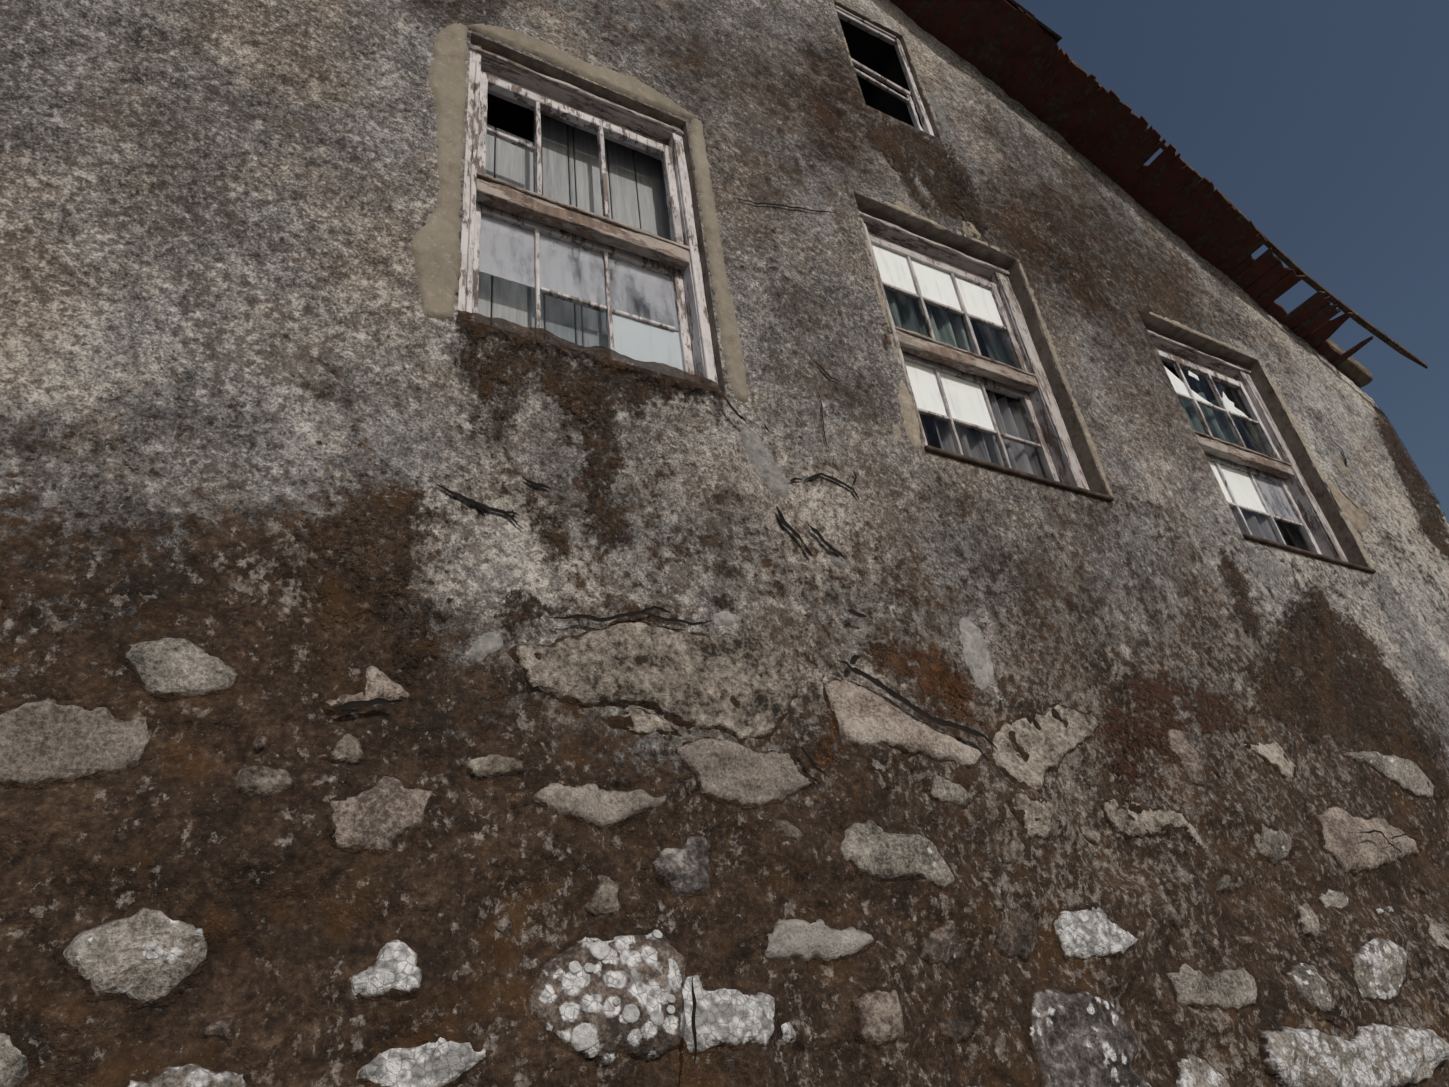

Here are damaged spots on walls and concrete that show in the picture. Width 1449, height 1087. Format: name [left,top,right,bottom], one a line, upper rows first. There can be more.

leakage [454,338,533,441]
crack [437,476,551,529]
leakage [531,387,643,571]
crack [548,606,713,625]
crack [847,609,867,618]
leakage [1305,585,1338,636]
crack [837,655,997,749]
spalling [823,677,1100,843]
spalling [52,901,216,1012]
spalling [355,1031,494,1087]
spalling [524,927,806,1067]
spalling [1254,936,1449,1087]